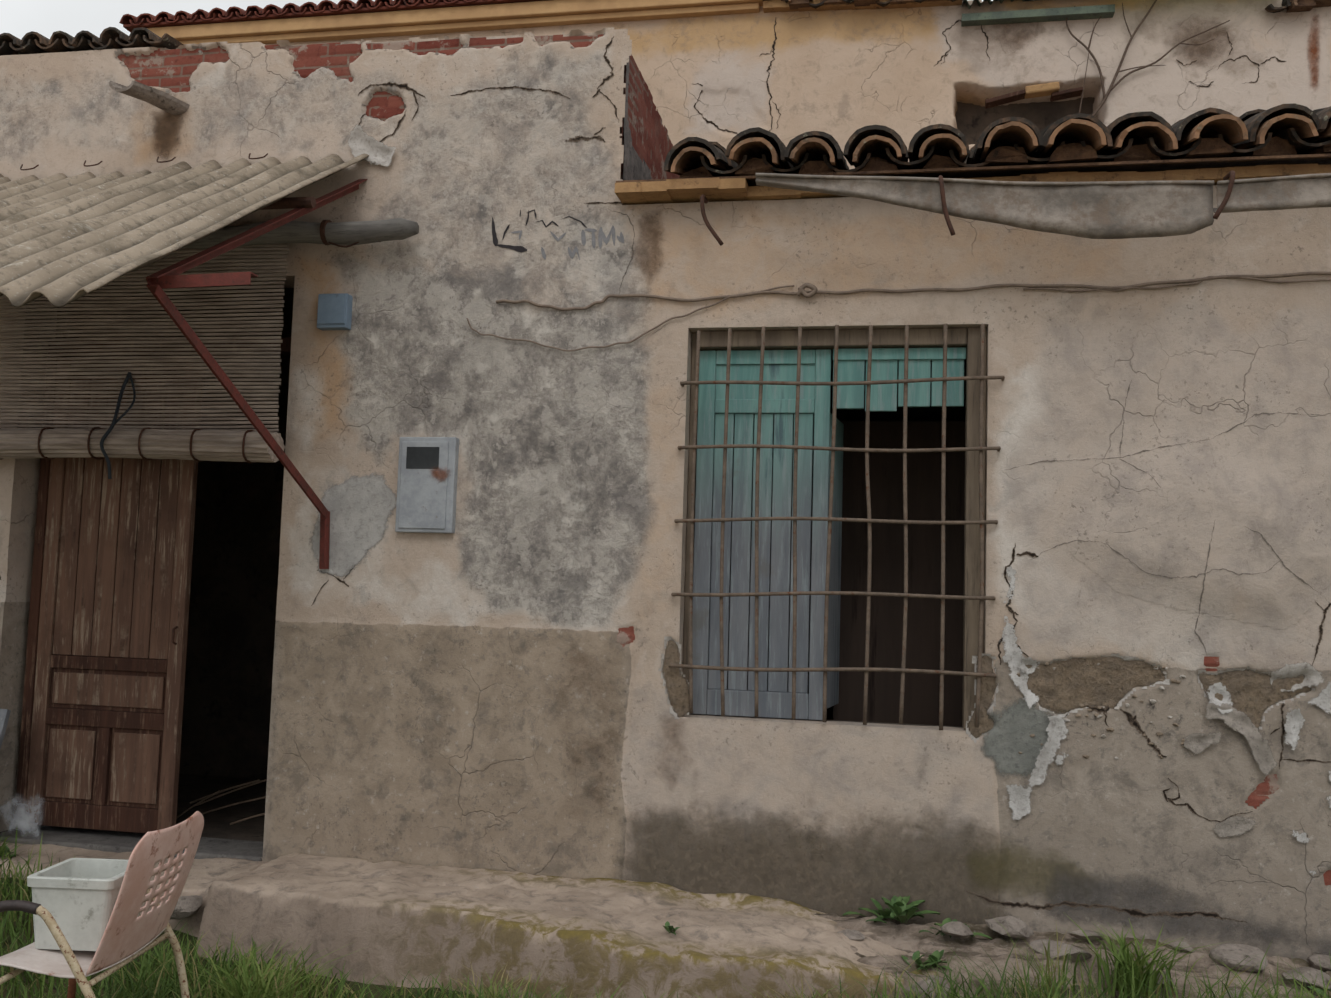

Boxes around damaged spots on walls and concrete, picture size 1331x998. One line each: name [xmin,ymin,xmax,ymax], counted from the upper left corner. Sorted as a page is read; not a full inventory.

flaking render [114,45,230,93]
flaking render [348,87,406,167]
flaking render [261,33,605,82]
crack [358,37,619,142]
crack [691,19,781,134]
crack [934,20,990,66]
crack [1176,32,1286,87]
crack [1005,380,1324,484]
flaking render [311,473,397,577]
crack [997,521,1331,665]
flaking render [966,567,1331,820]
leakage [621,815,1002,925]